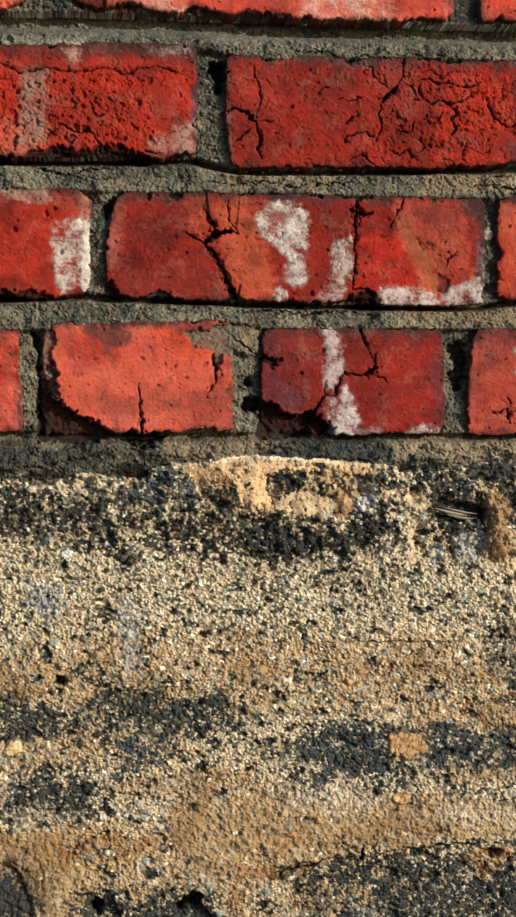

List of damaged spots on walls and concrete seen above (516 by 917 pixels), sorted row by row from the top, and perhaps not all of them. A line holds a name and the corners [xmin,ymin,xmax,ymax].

crack [302,51,516,163]
crack [187,73,385,422]
peeling [181,454,376,522]